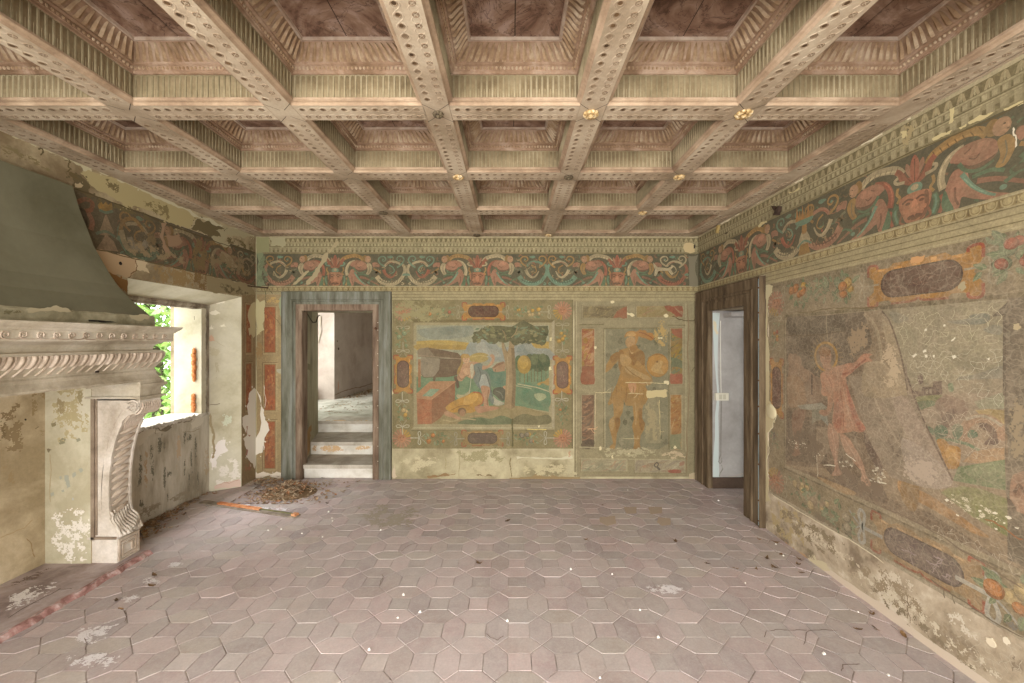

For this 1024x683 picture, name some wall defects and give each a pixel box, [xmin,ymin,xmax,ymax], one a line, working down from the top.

peeling [12,136,256,338]
flaking render [209,439,230,470]
flaking render [242,386,281,479]
crack [795,306,1003,459]
crack [728,415,1023,681]
peeling [808,555,990,683]
flaking render [986,637,1011,648]